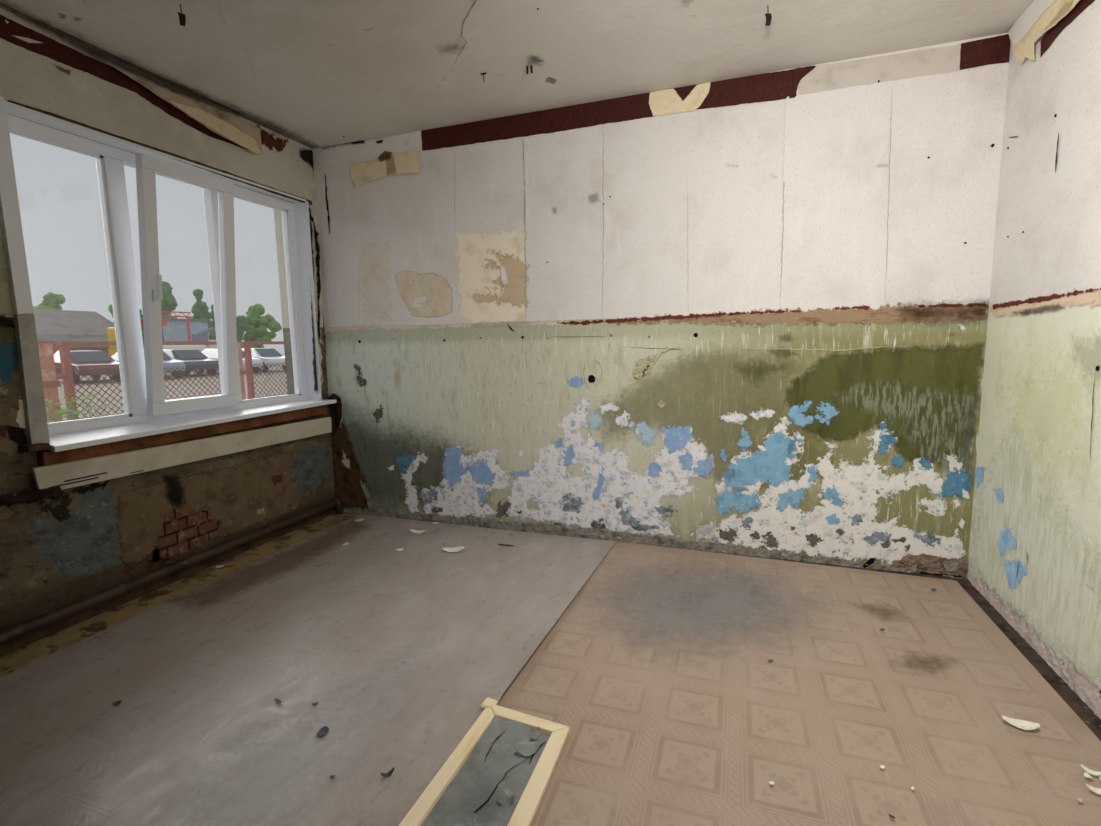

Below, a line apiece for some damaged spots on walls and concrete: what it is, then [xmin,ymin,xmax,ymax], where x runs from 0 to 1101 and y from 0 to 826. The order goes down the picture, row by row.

flaking render [309,181,324,394]
peeling [395,229,530,327]
leakage [787,344,984,473]
peeling [116,375,1101,719]
leakage [972,422,1101,677]
peeling [1002,715,1040,730]
peeling [1076,764,1101,803]